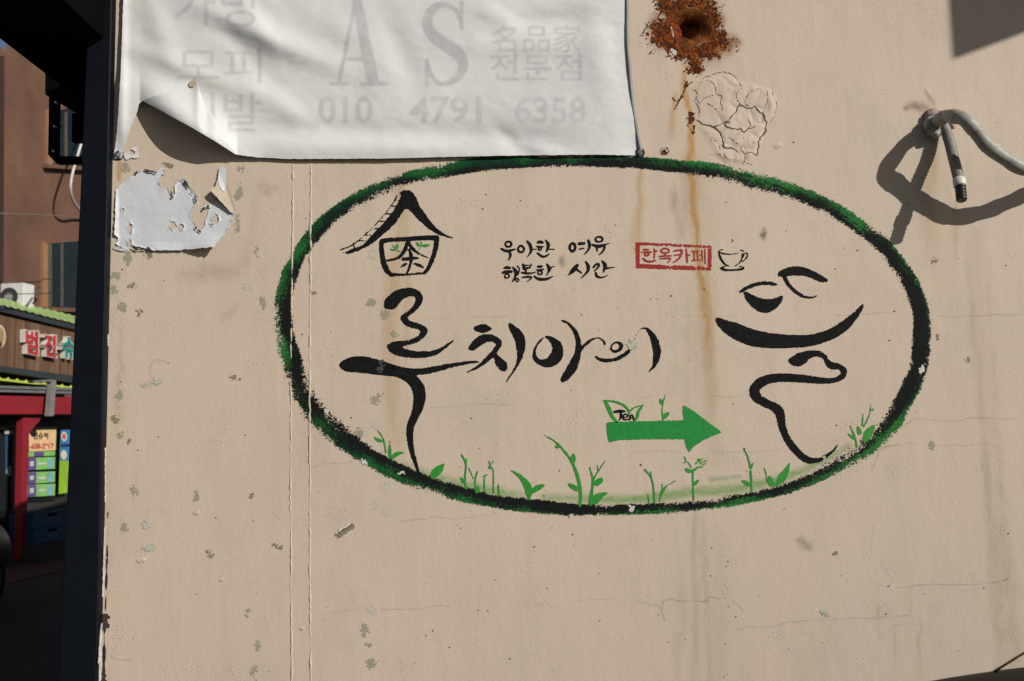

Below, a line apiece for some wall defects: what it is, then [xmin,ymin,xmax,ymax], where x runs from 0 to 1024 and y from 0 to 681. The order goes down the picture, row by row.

corrosion [641,0,738,161]
peeling [110,162,245,318]
corrosion [690,174,705,290]